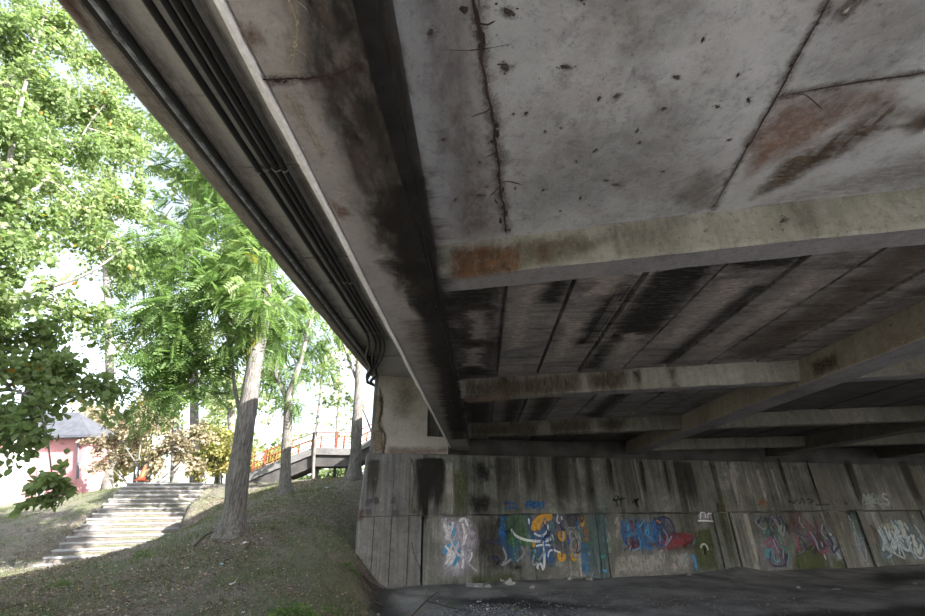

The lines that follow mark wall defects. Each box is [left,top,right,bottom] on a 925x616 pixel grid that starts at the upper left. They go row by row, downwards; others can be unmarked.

crack [445,0,522,234]
crack [699,0,925,213]
leakage [286,0,579,439]
corrosion [453,245,520,277]
leakage [579,275,629,297]
leakage [605,279,749,358]
leakage [697,272,832,353]
leakage [367,460,379,495]
leakage [390,448,452,519]
leakage [663,461,698,507]
leakage [470,494,512,567]